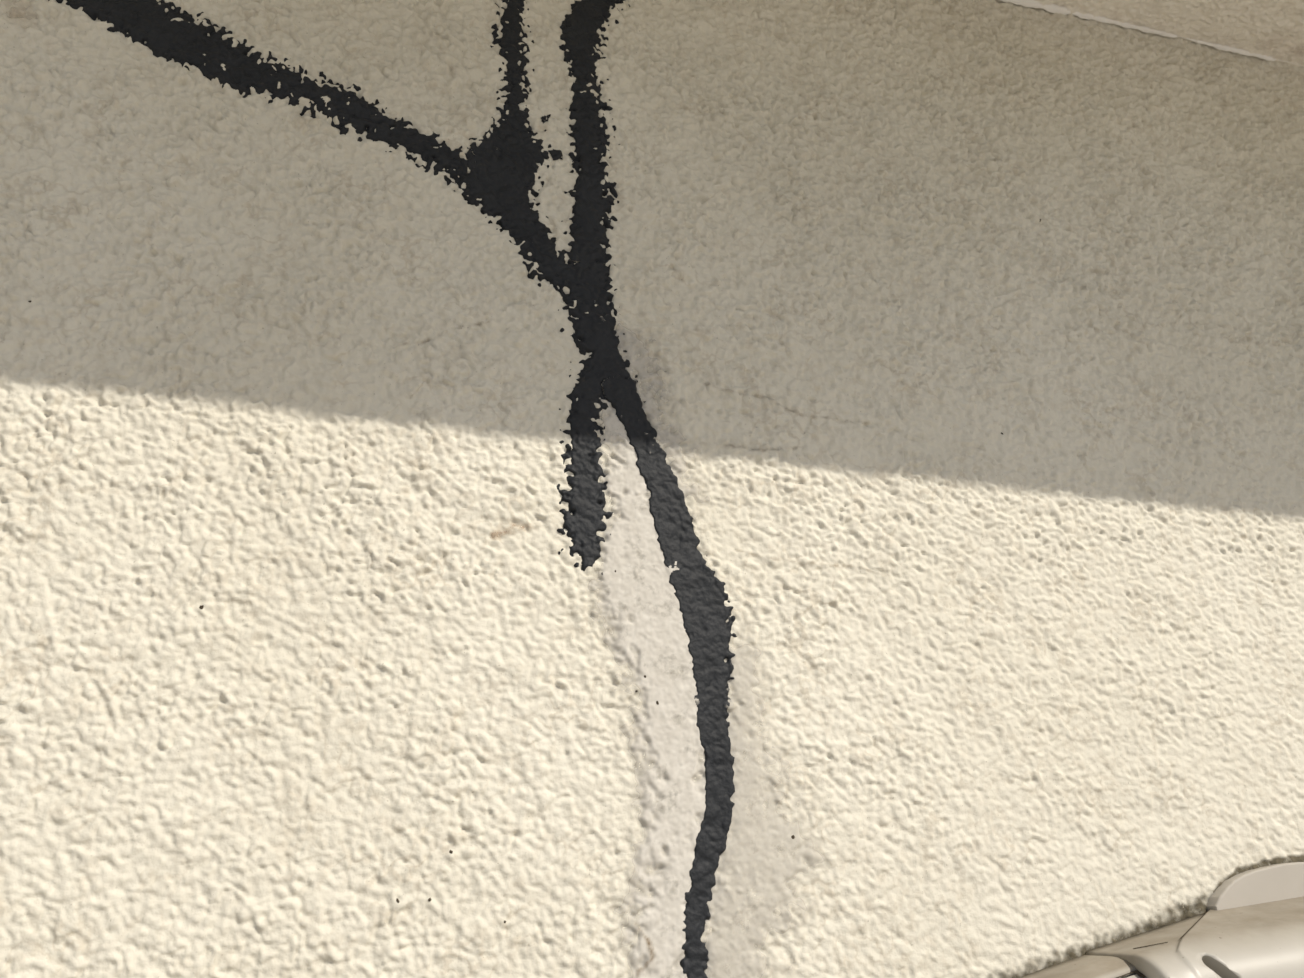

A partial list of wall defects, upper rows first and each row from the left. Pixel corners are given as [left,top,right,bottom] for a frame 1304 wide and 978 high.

crack [48,0,737,978]